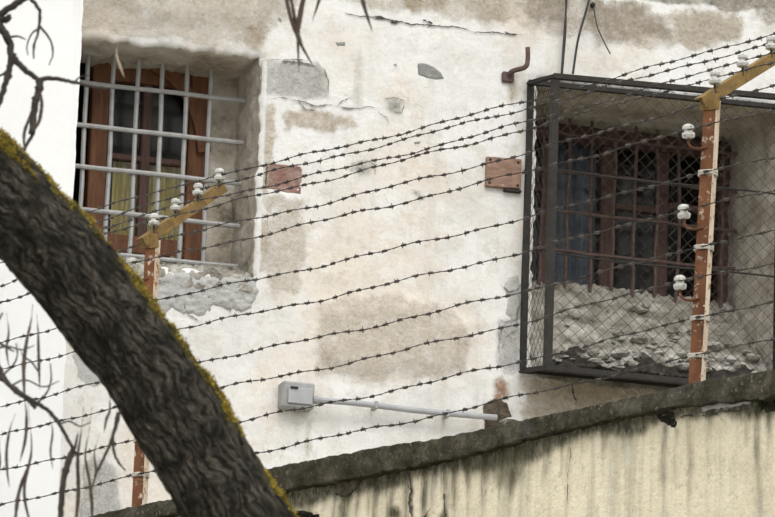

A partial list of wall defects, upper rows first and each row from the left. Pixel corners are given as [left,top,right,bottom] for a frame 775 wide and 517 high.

crack [344,12,523,35]
crack [260,59,404,127]
spalling [158,107,305,317]
damp [522,379,657,419]
damp [286,401,775,517]
crack [407,475,446,517]